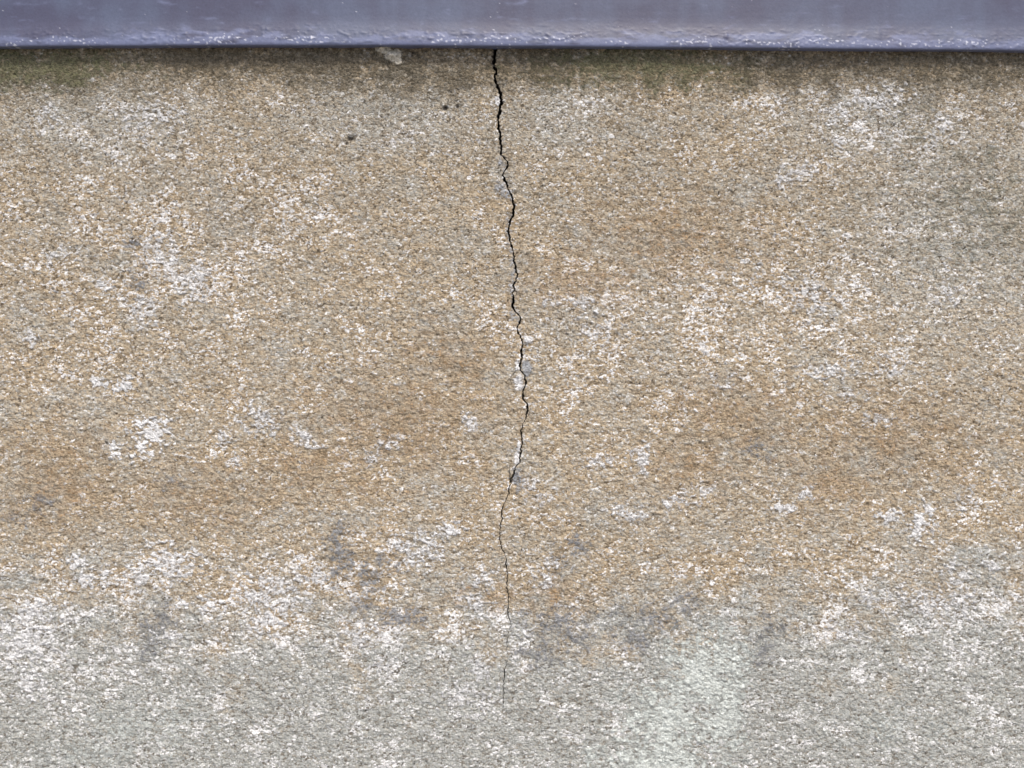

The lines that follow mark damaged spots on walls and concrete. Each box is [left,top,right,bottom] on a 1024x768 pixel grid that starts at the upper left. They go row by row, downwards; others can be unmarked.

crack [490,49,533,708]